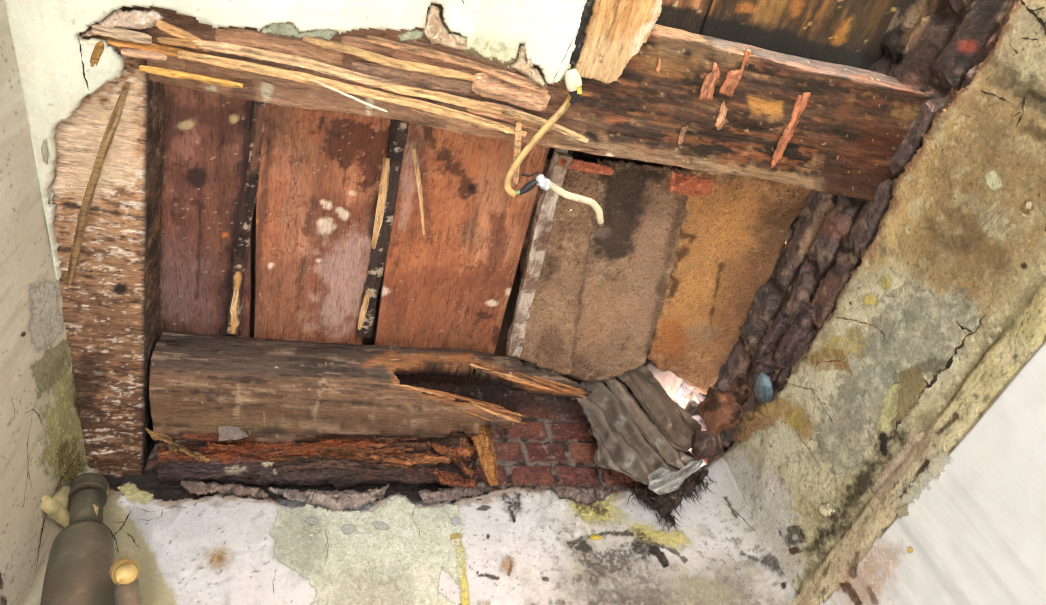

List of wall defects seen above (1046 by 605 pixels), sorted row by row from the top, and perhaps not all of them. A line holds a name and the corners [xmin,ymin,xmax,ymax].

spalling [81,9,165,37]
peeling [261,23,337,40]
spalling [398,4,467,51]
crack [1009,0,1046,54]
spalling [510,44,546,87]
water stain [994,63,1046,139]
peeling [31,340,69,398]
crack [919,316,984,399]
water stain [41,349,86,488]
peeling [101,380,649,605]